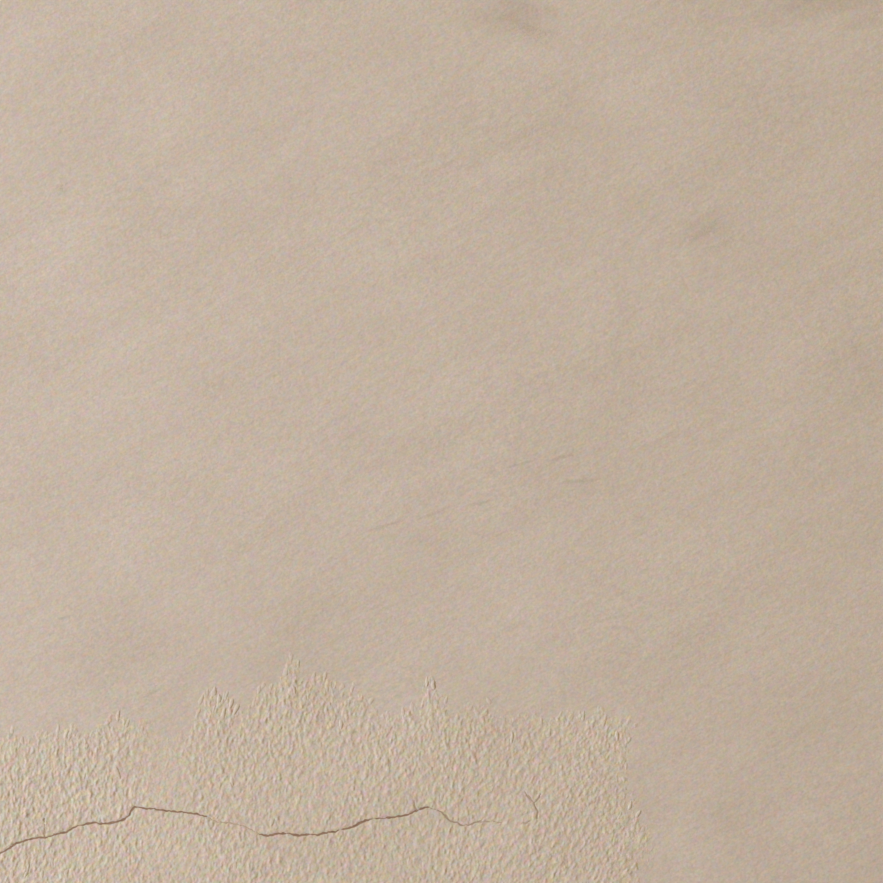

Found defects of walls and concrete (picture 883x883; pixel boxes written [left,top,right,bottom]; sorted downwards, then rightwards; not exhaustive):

spalling [0,649,656,883]
crack [0,803,502,854]
crack [523,792,541,824]